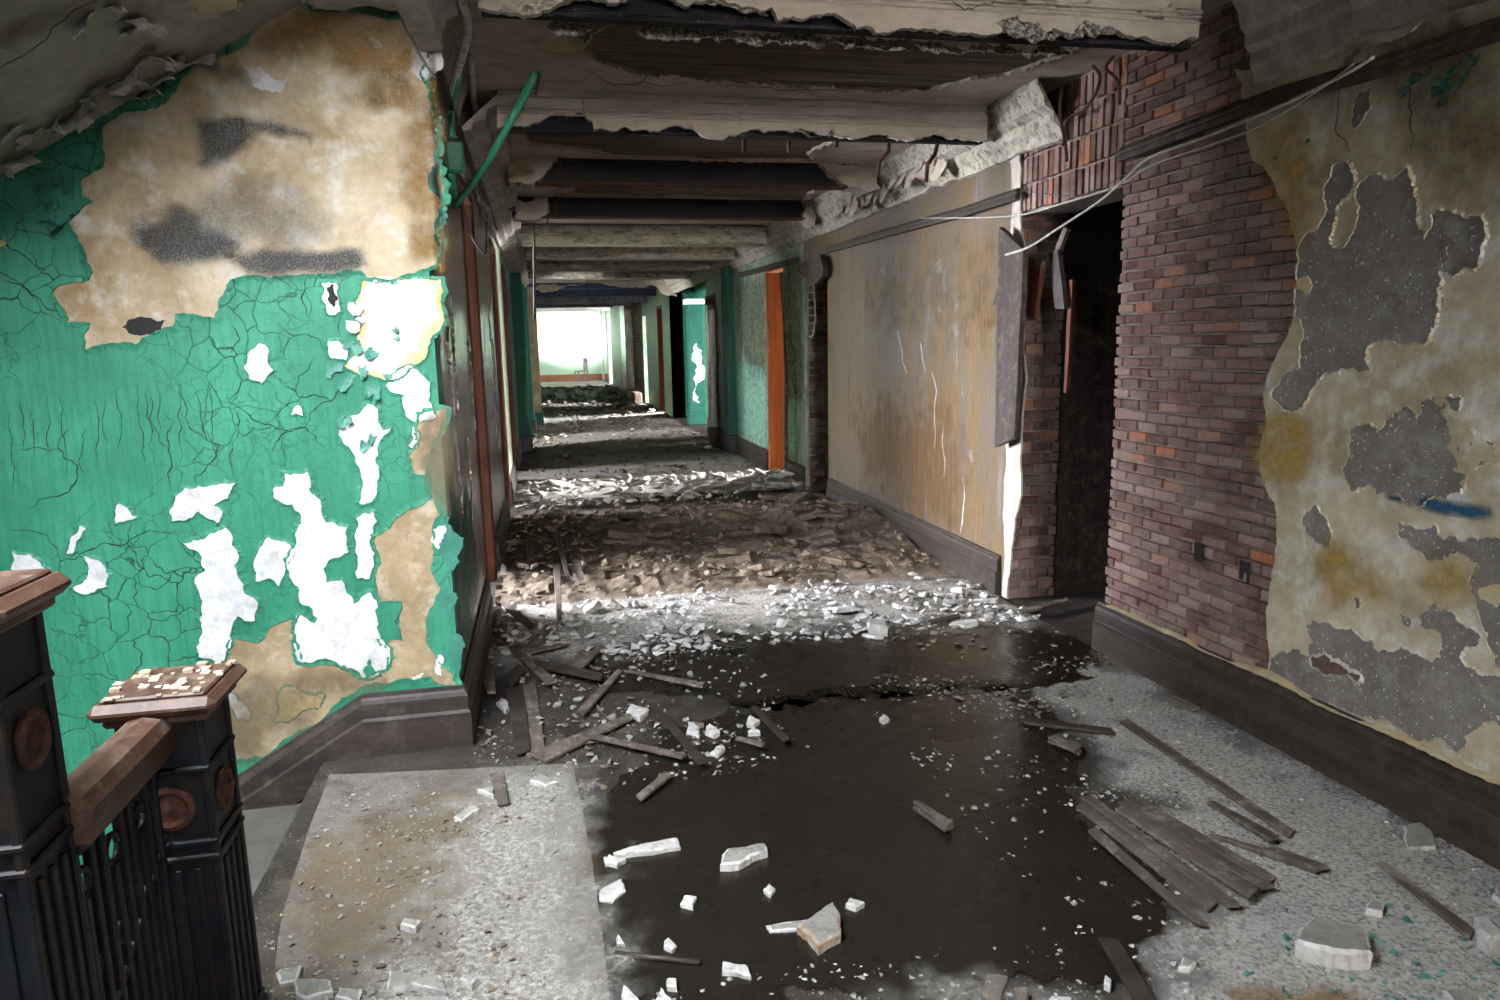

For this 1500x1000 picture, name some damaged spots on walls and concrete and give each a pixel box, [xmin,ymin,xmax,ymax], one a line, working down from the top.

flaking render [547,21,592,38]
flaking render [636,16,1118,59]
leakage [198,118,308,166]
crack [0,222,86,316]
leakage [135,187,365,277]
peeling [833,157,946,222]
crack [8,280,351,590]
peeling [0,0,489,767]
leakage [877,331,946,483]
flaking render [1002,5,1500,786]